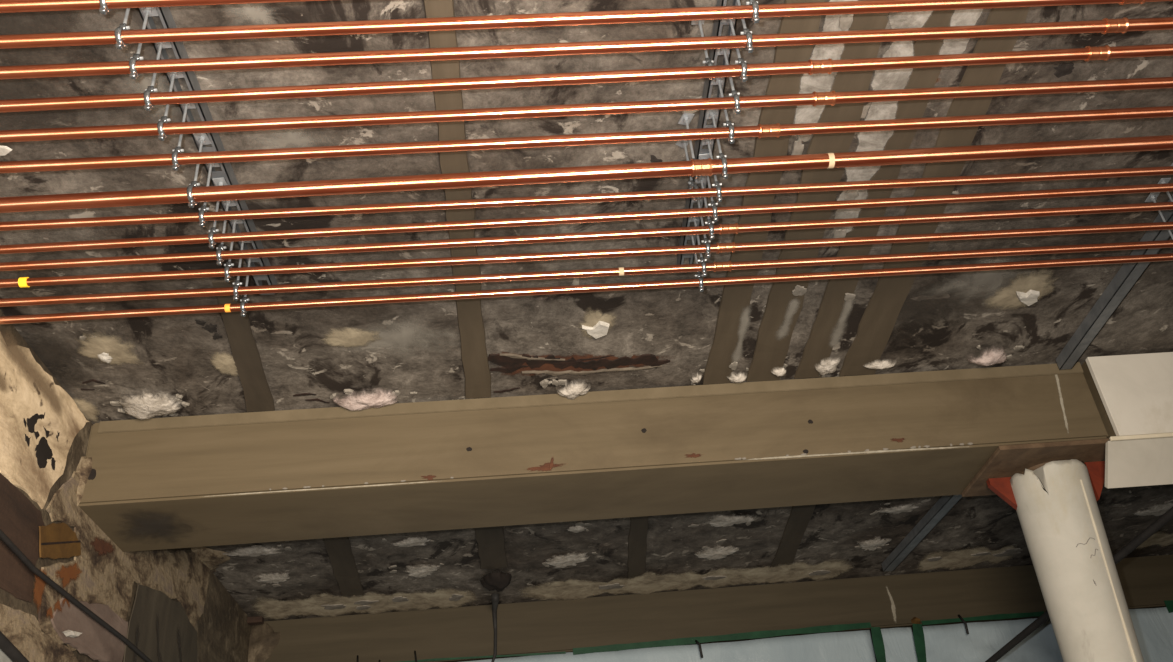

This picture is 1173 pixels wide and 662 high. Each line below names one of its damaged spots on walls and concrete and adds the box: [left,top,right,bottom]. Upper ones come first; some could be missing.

peeling [0,332,210,662]